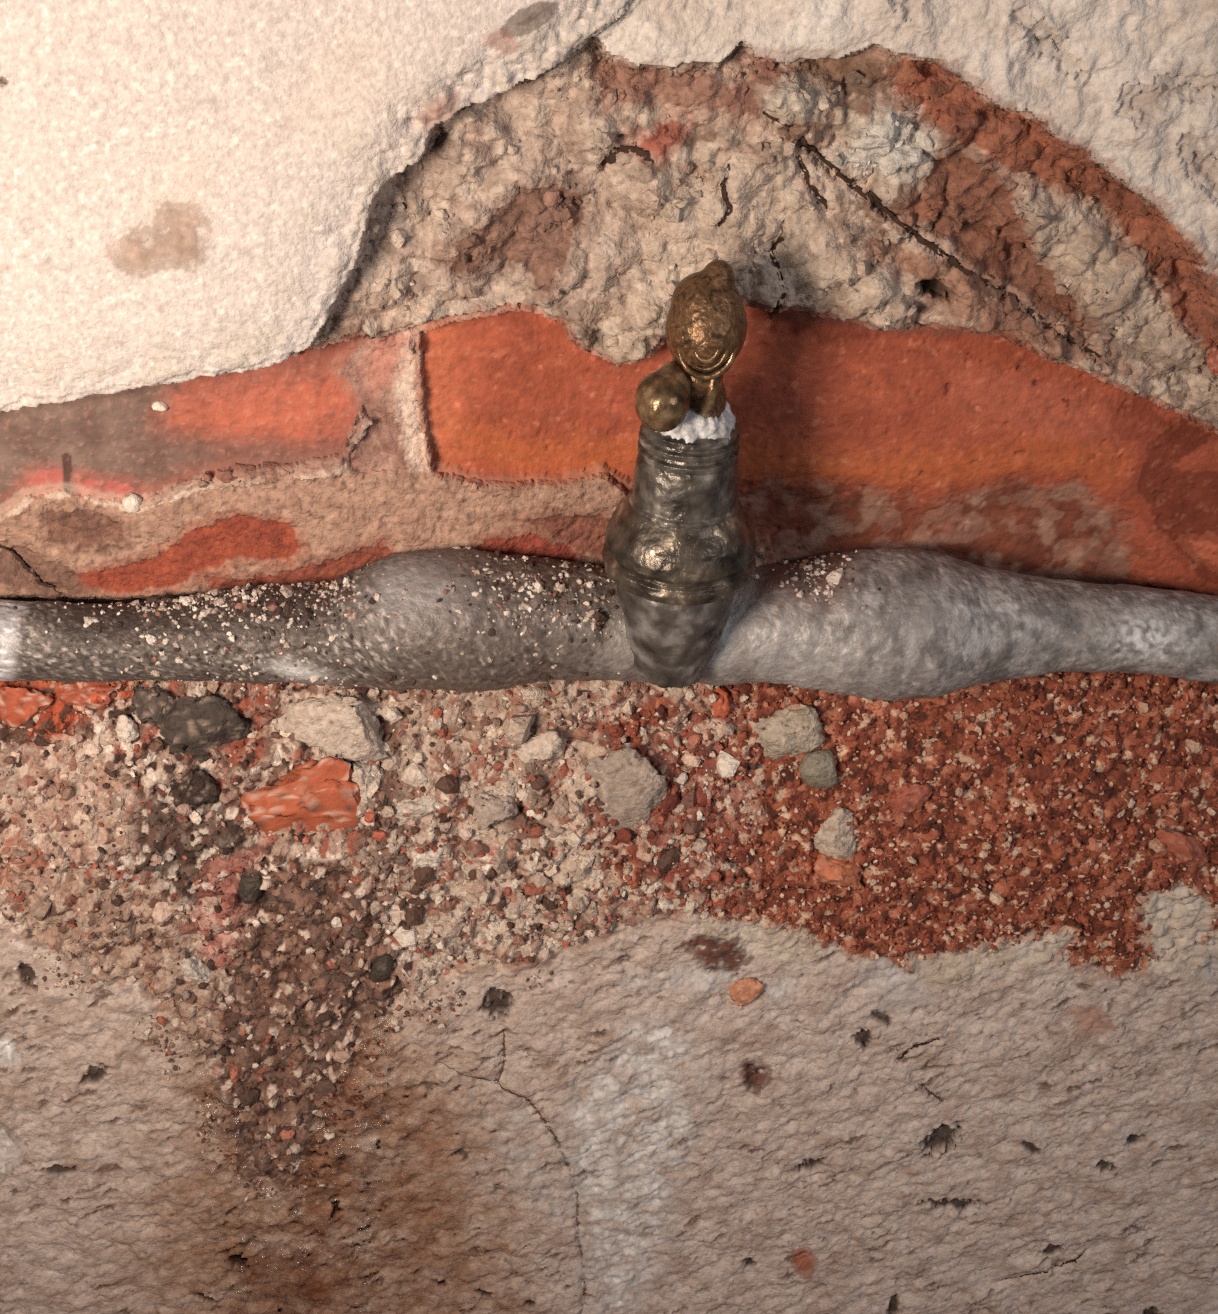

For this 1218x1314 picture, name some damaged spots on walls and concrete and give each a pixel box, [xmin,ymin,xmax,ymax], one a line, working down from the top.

spalling [501,3,553,38]
spalling [0,36,1218,604]
crack [762,111,1109,366]
spalling [0,672,1218,1202]
crack [440,1030,586,1314]
spalling [911,1198,993,1210]
spalling [1041,1244,1067,1256]